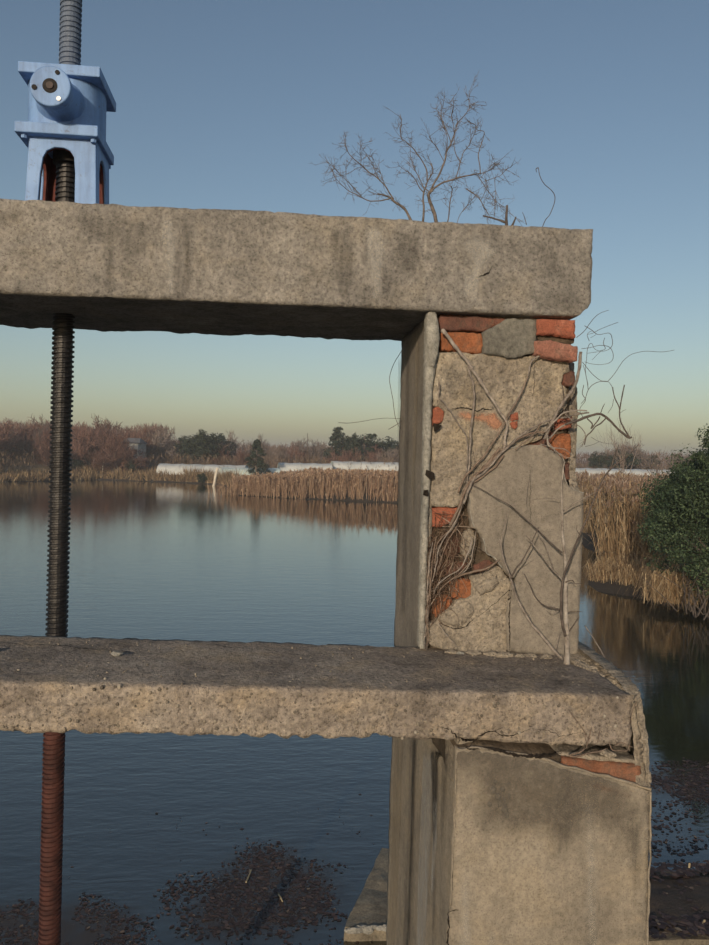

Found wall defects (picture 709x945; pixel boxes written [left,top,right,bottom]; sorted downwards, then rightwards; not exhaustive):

spalling [438,314,511,354]
spalling [529,319,578,387]
spalling [432,407,444,432]
spalling [524,416,584,493]
peeling [430,492,502,627]
crack [442,590,512,651]
spalling [0,642,652,791]